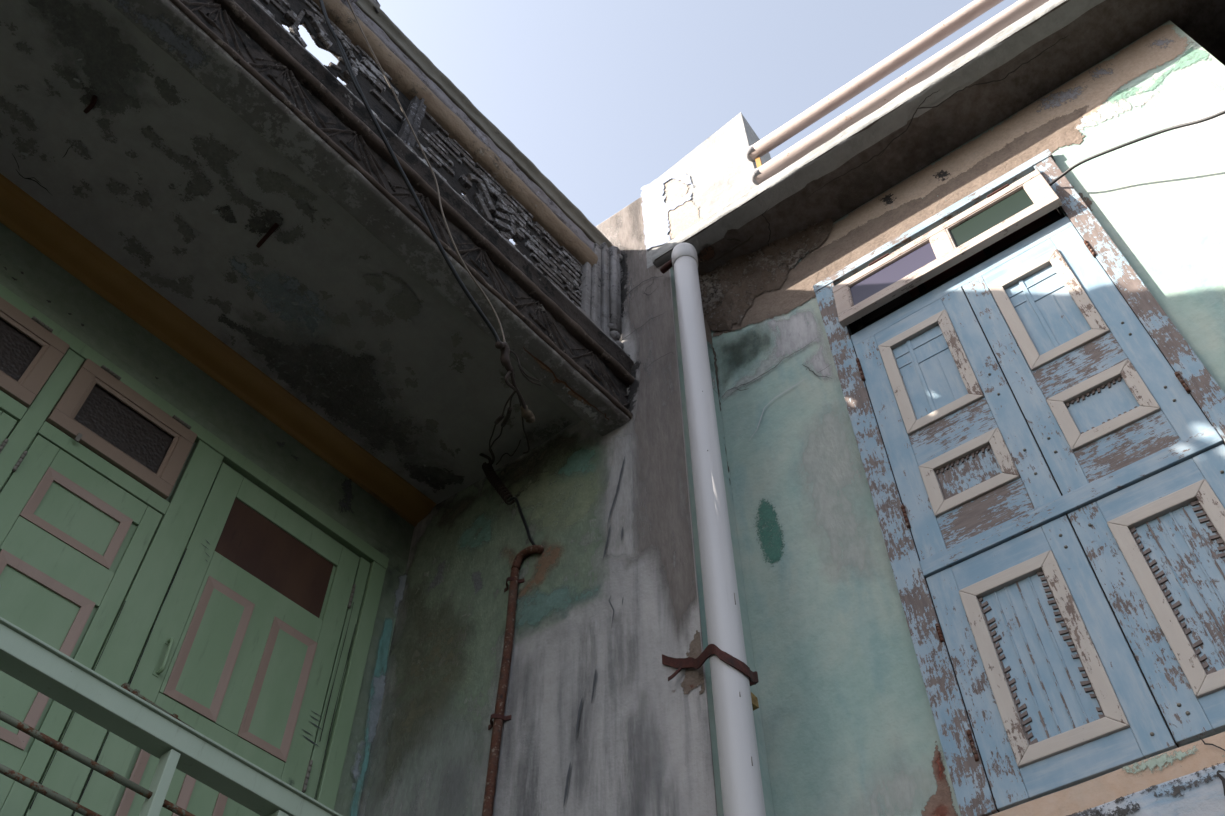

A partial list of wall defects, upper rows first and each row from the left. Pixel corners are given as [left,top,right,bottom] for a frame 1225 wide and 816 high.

peeling [141,125,317,256]
spalling [699,24,1225,376]
damp [363,421,606,816]
spalling [921,741,958,816]
peeling [1122,745,1198,774]
crack [1200,738,1225,796]